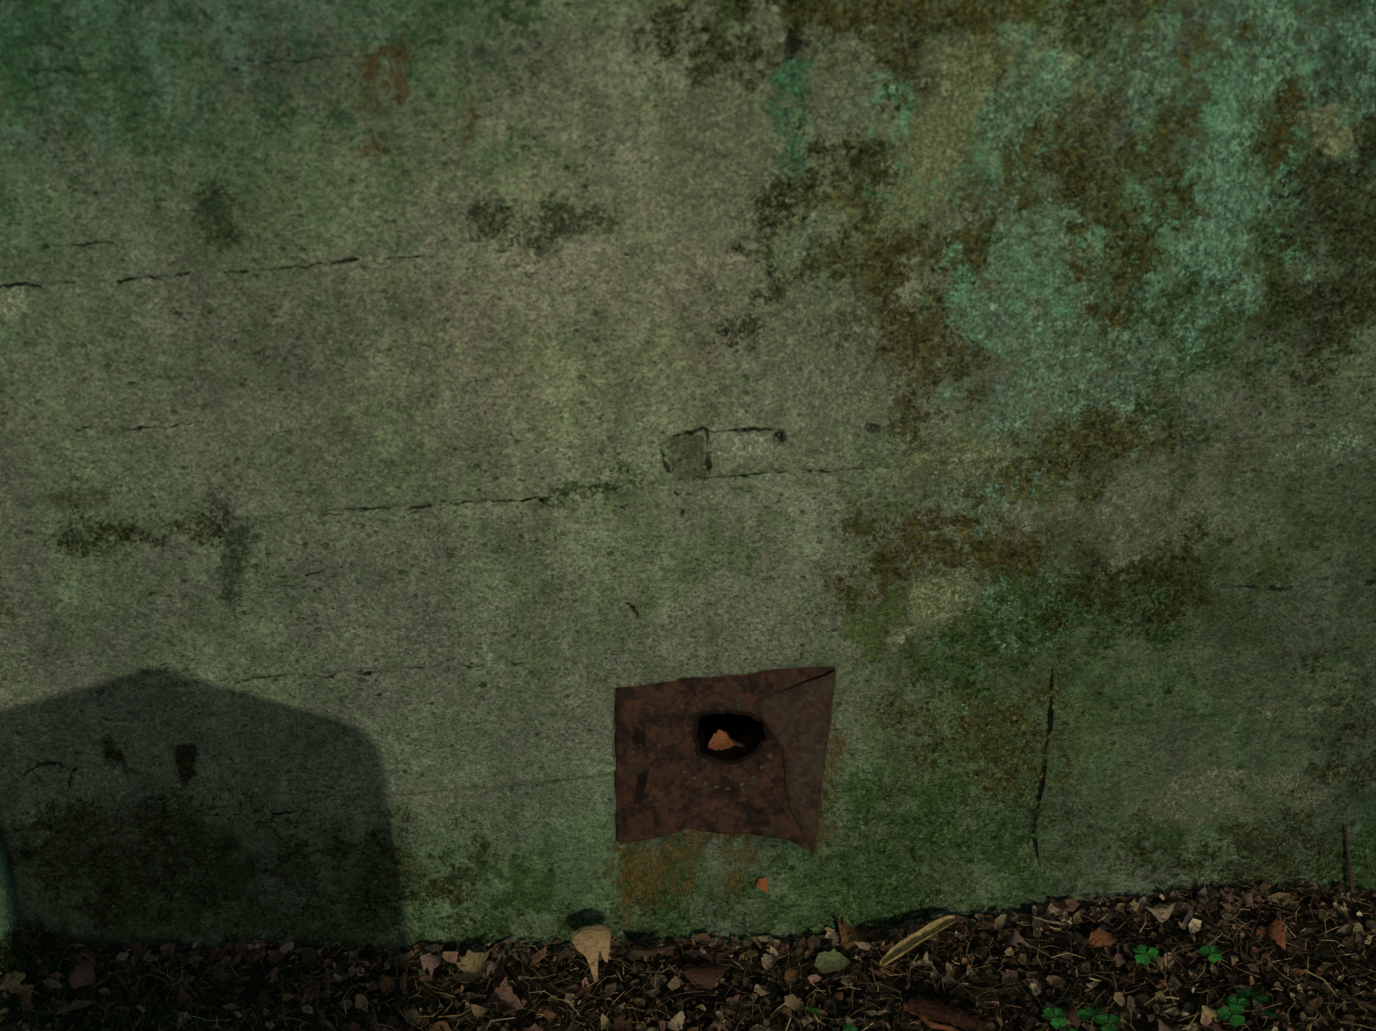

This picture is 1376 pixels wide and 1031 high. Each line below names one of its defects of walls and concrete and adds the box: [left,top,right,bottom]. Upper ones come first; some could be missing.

crack [784,0,800,87]
water stain [649,417,778,545]
spalling [174,744,199,789]
crack [1028,668,1054,868]